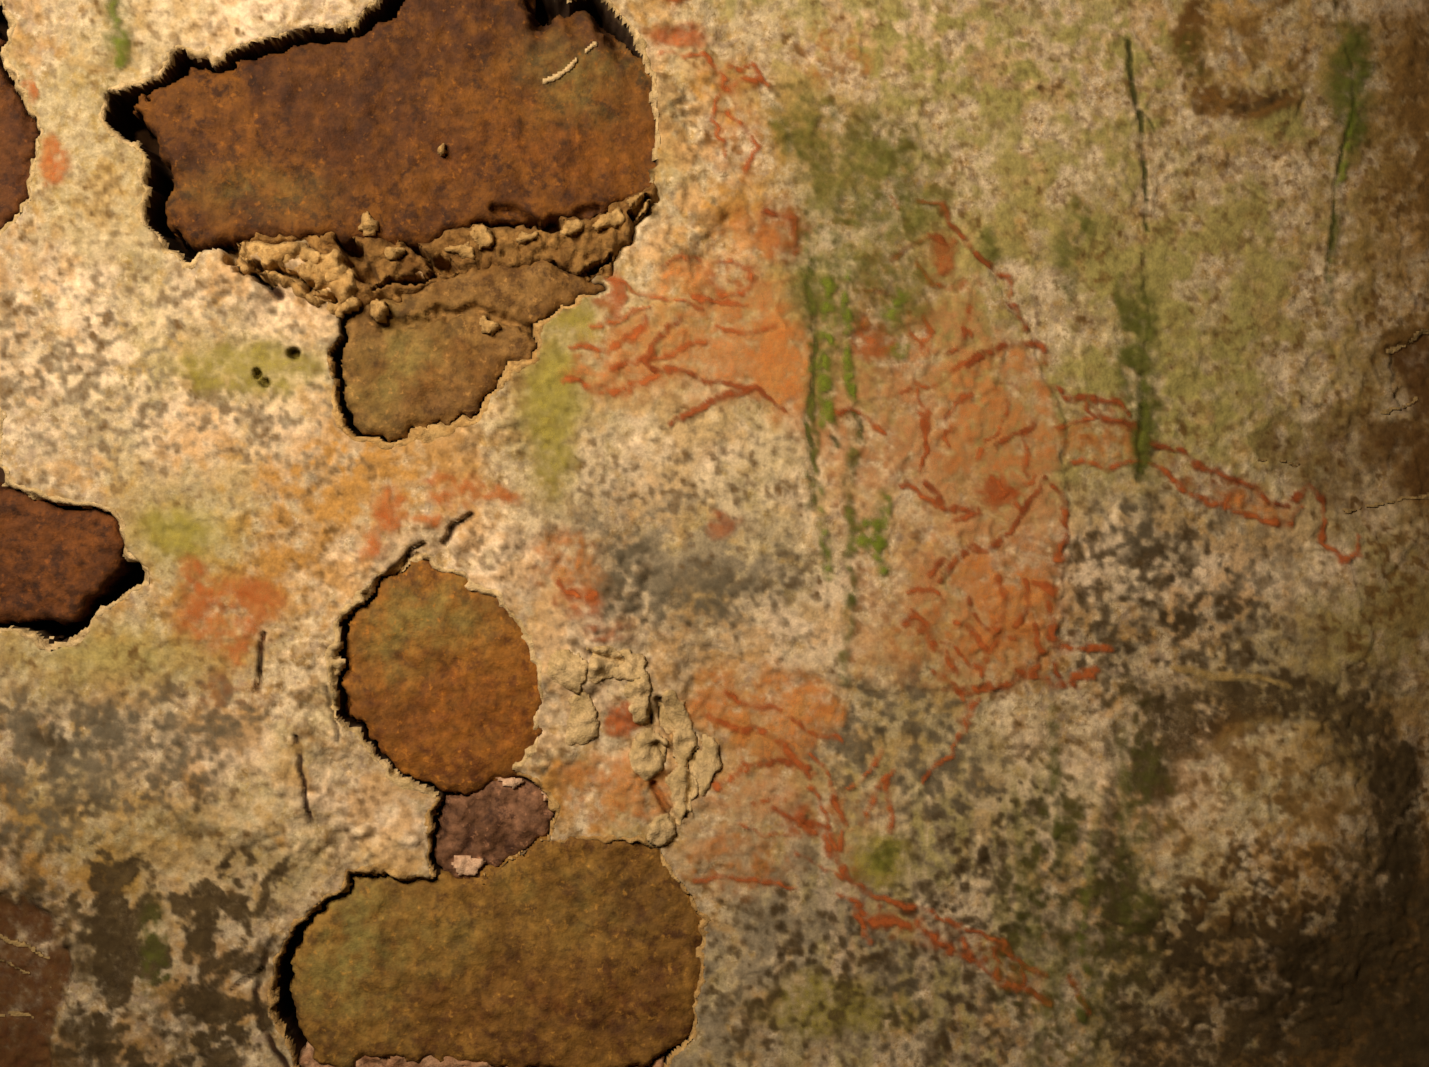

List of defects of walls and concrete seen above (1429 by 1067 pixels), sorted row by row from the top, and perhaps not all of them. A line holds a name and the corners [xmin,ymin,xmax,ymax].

flaking render [0,0,44,235]
flaking render [98,0,660,450]
leakage [803,259,855,511]
flaking render [0,408,150,652]
leakage [820,495,891,602]
flaking render [266,552,723,1067]